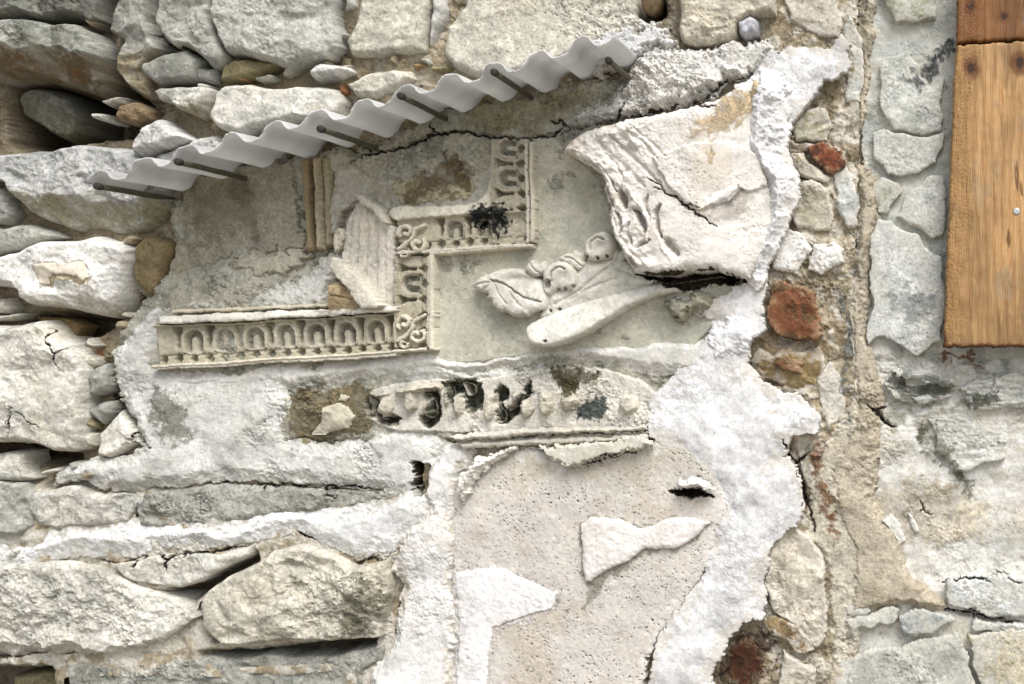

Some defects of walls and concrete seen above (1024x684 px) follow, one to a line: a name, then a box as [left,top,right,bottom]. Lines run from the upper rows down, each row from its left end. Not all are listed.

crack [353,75,752,162]
crack [649,179,717,227]
spalling [696,184,750,222]
water stain [479,207,513,239]
crack [45,330,68,368]
crack [783,440,816,531]
crack [108,545,238,570]
peeling [579,515,711,608]
crack [942,571,1021,583]
peeling [450,564,563,684]
crack [944,608,1013,624]